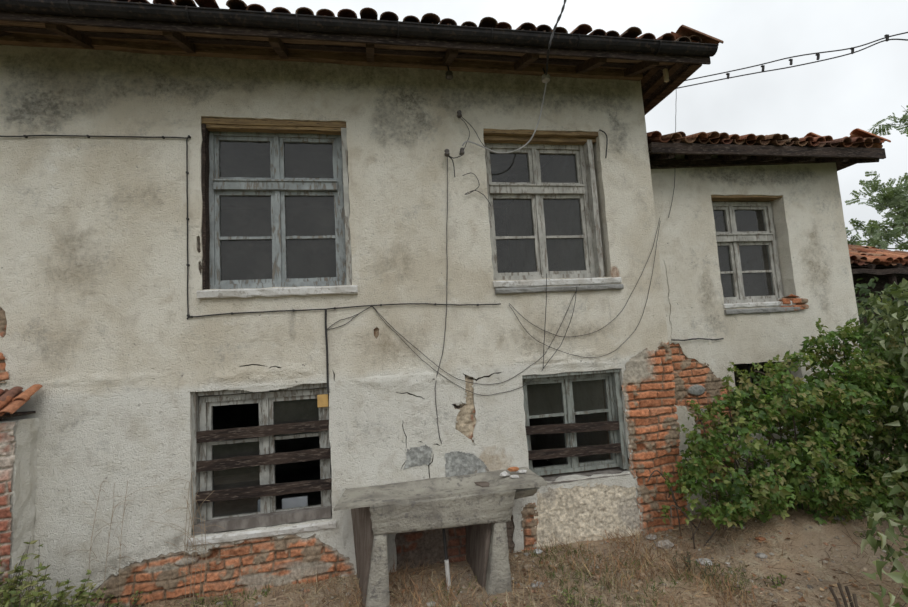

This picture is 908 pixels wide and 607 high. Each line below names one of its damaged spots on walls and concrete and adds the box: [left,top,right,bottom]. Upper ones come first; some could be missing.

spalling [0,353,9,383]
spalling [454,374,476,445]
spalling [506,341,734,553]
spalling [82,533,356,607]